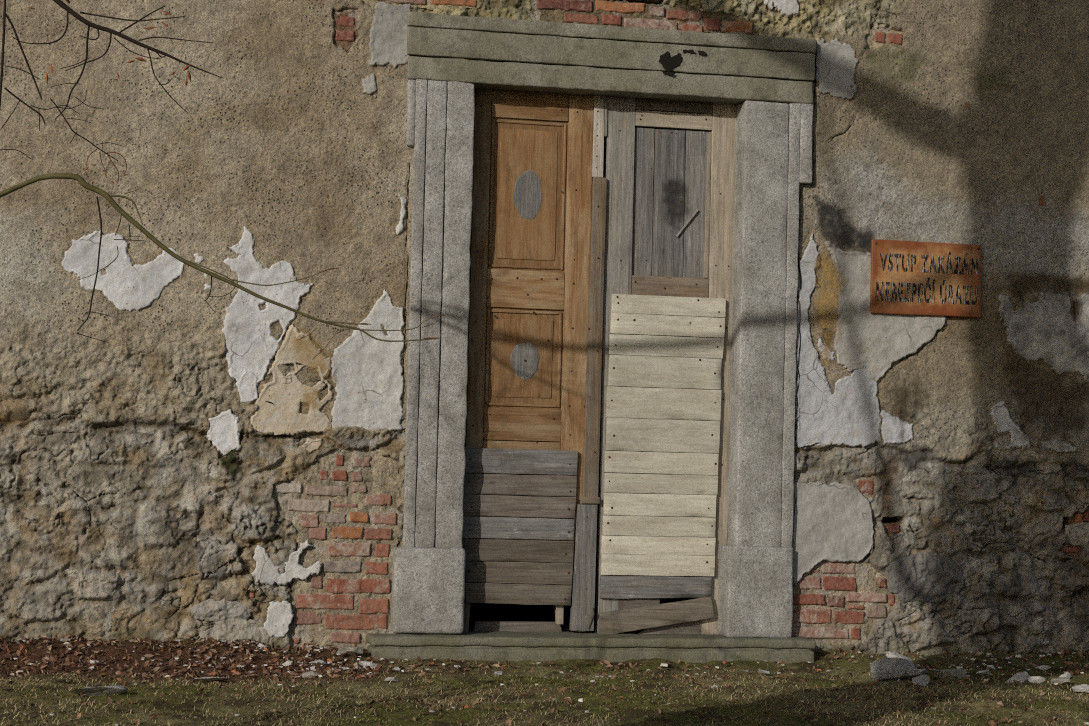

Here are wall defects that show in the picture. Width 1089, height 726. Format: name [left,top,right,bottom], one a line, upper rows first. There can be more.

flaking render [528,0,759,35]
flaking render [865,27,905,50]
flaking render [396,197,407,234]
flaking render [795,234,946,449]
flaking render [998,285,1089,383]
flaking render [207,226,405,649]
flaking render [990,401,1078,453]
flaking render [882,516,901,535]
flaking render [1058,506,1089,556]
flaking render [792,562,896,645]